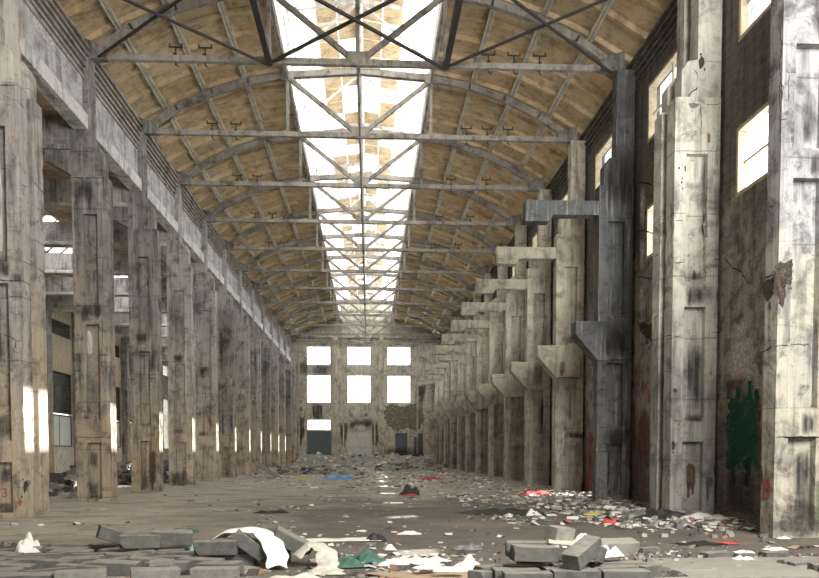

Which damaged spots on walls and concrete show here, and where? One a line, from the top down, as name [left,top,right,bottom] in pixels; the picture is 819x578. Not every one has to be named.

crack [715,258,774,284]
spalling [763,259,793,315]
spalling [639,321,652,344]